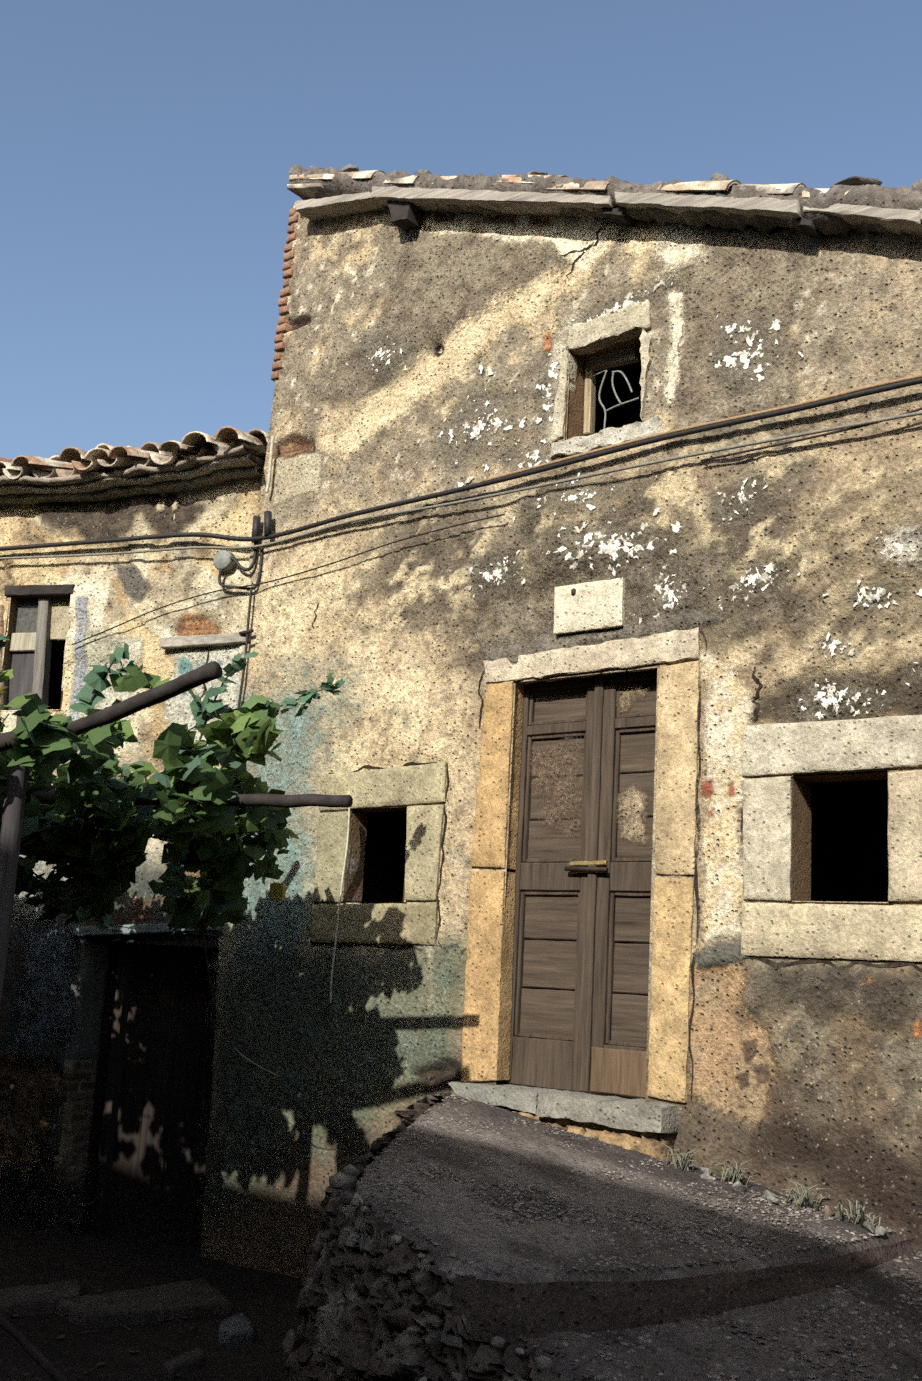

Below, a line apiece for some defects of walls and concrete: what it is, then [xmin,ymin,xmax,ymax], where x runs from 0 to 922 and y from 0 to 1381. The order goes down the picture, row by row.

crack [560,228,605,281]
flaking render [411,211,705,487]
peeling [709,315,780,382]
peeling [537,471,800,624]
peeling [875,531,916,558]
peeling [810,632,855,658]
peeling [799,679,887,720]